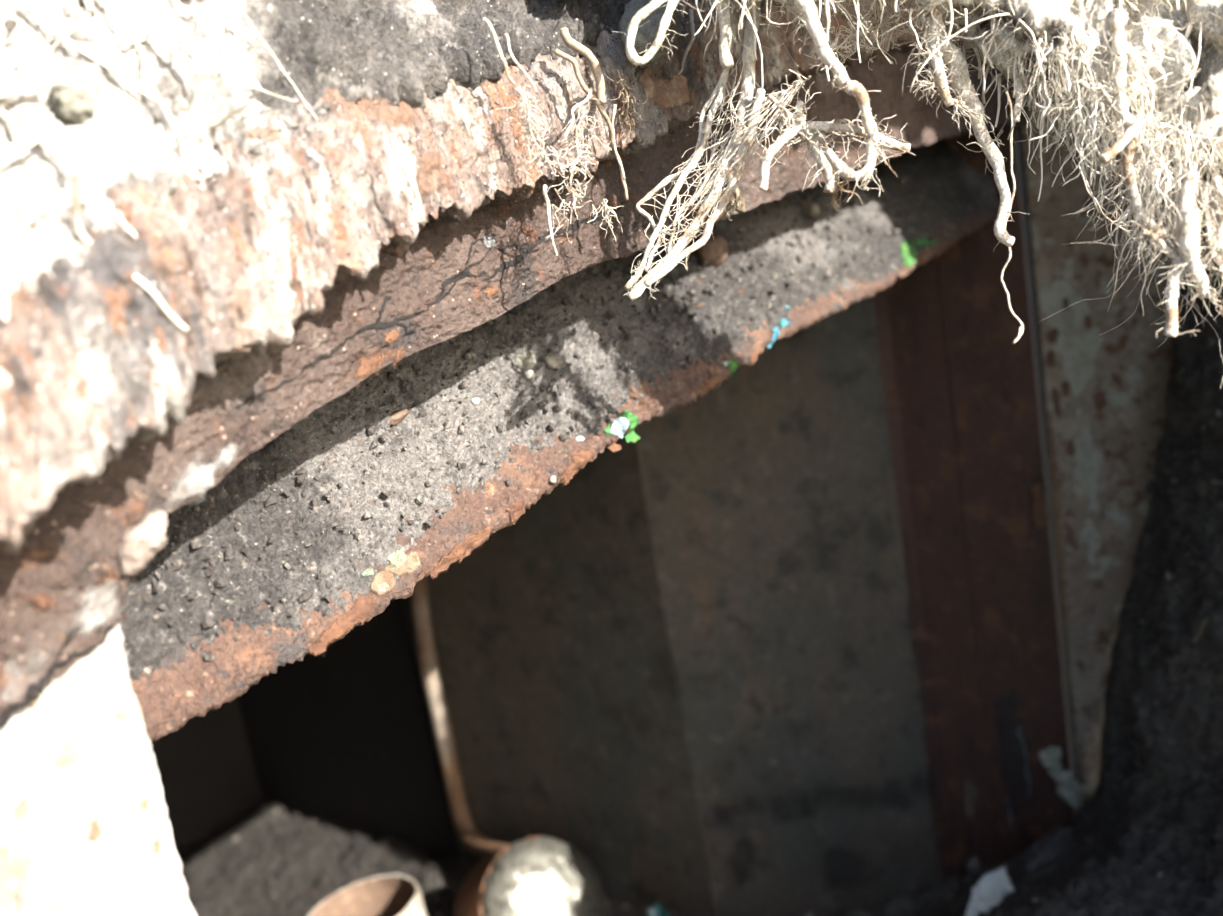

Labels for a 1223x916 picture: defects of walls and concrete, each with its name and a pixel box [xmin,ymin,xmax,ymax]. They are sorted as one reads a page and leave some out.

crack [229,201,629,413]
corrosion [484,284,499,298]
corrosion [356,330,404,379]
peeling [605,410,640,452]
spalling [170,444,237,501]
corrosion [561,448,595,484]
corrosion [507,499,524,524]
peeling [362,547,421,595]
corrosion [429,526,493,578]
spalling [79,582,117,631]
corrosion [309,596,376,655]